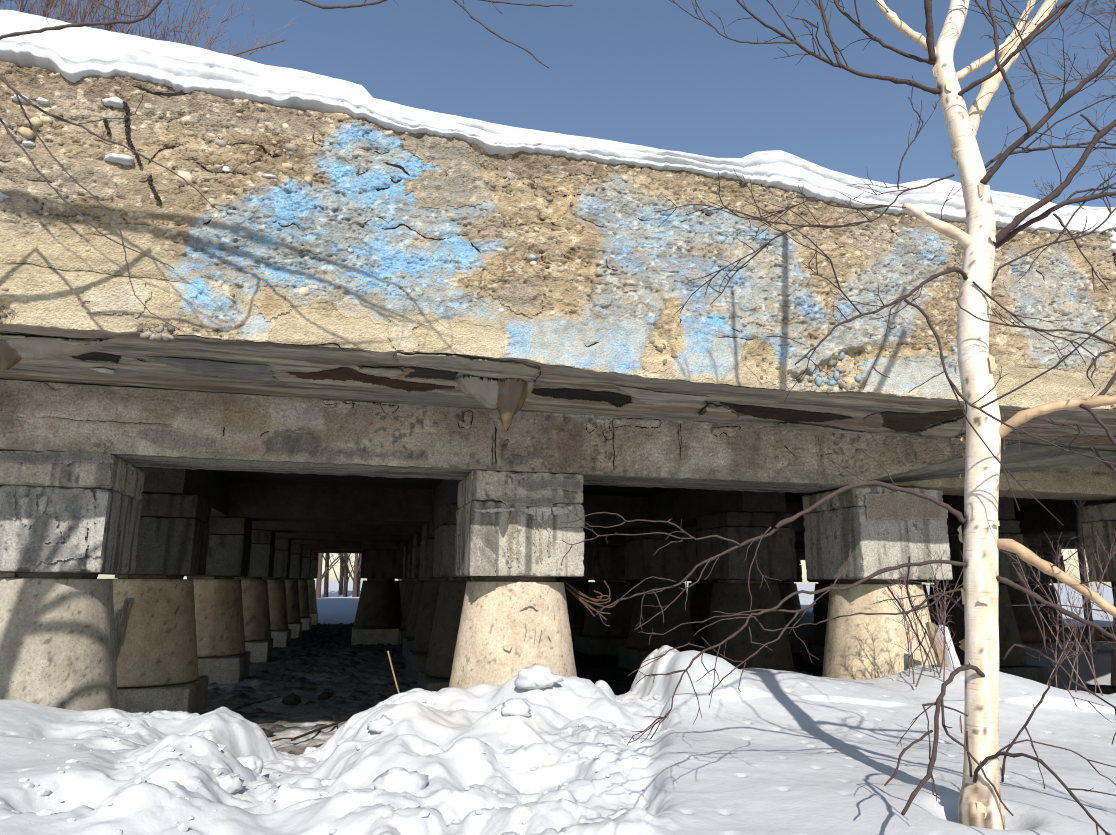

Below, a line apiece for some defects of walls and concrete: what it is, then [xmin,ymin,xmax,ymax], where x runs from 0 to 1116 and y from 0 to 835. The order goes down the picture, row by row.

spalling [0,116,64,147]
crack [353,151,481,253]
peeling [137,104,966,480]
leakage [470,415,588,576]